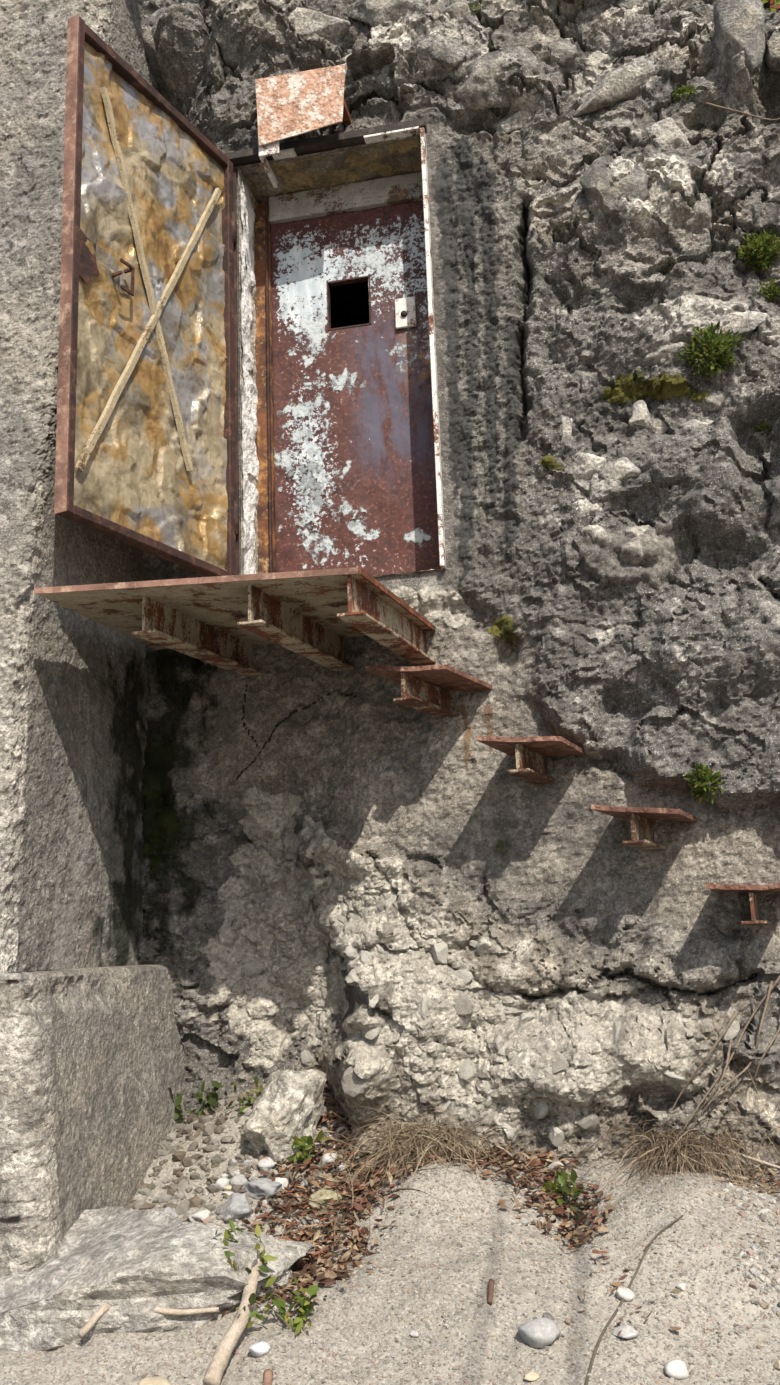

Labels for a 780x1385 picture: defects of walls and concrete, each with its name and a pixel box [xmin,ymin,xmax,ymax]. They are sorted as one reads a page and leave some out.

peeling [337,233,413,287]
peeling [240,181,380,574]
peeling [390,332,417,372]
peeling [404,528,431,547]
damp [93,645,219,995]
crack [486,969,758,1021]